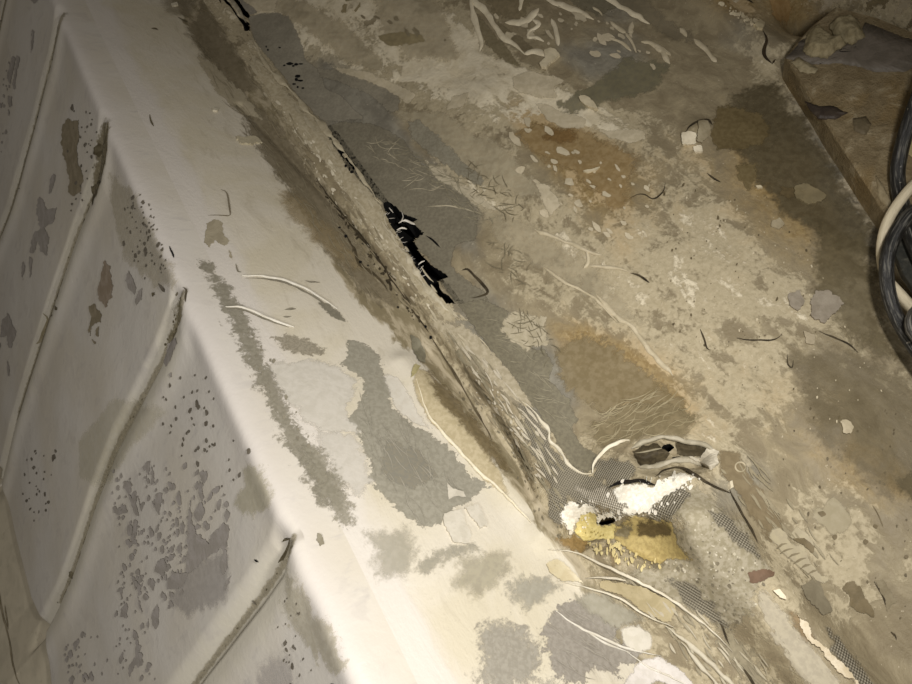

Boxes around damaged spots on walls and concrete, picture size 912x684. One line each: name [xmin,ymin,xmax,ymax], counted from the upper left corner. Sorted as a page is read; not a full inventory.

peeling [60,118,83,196]
water stain [514,123,637,211]
peeling [21,174,57,280]
peeling [204,219,234,261]
peeling [236,0,598,472]
water stain [710,82,899,358]
peeling [0,313,16,348]
water stain [556,337,695,446]
peeling [689,448,719,470]
peeling [141,481,231,591]
peeling [119,588,159,629]